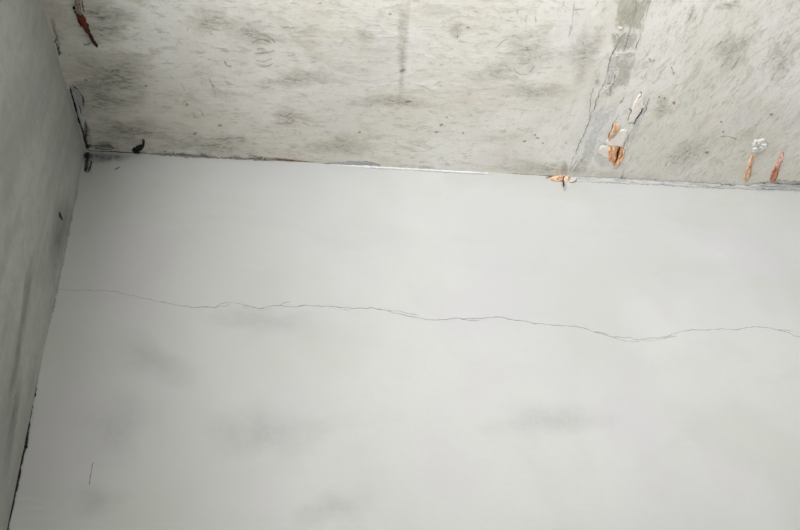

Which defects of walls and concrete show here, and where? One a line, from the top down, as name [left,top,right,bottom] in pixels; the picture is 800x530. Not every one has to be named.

crack [571,33,638,173]
spalling [597,93,666,169]